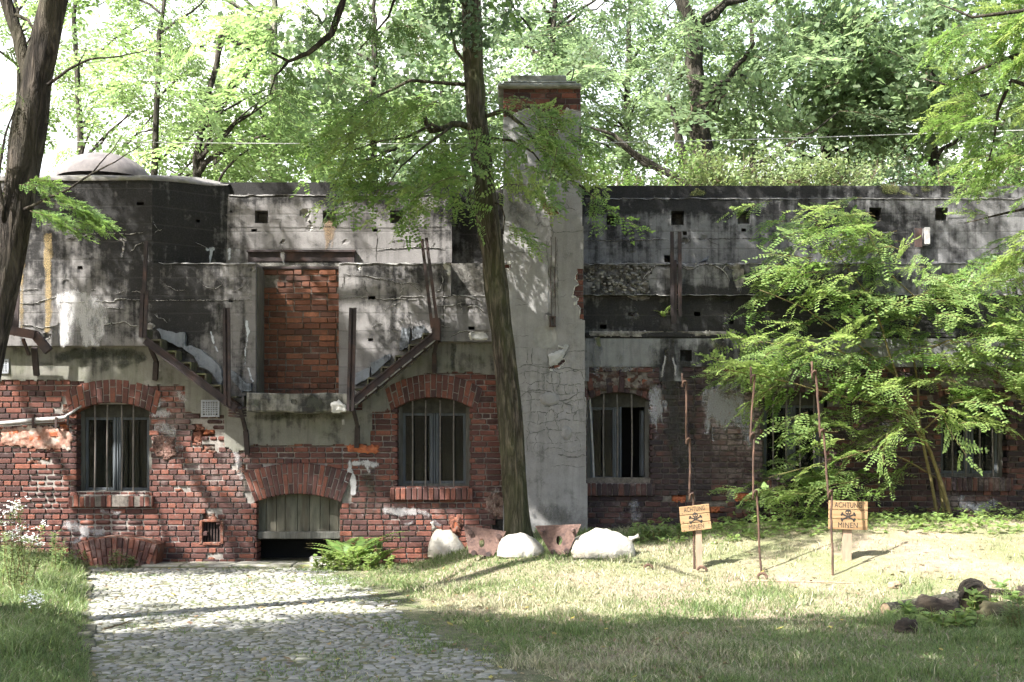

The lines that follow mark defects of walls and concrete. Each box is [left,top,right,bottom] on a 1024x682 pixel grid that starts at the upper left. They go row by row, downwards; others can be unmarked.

flaking render [503,89,581,148]
crack [66,221,162,252]
corrosion [44,234,52,333]
damp [47,289,146,370]
crack [20,279,250,329]
flaking render [548,344,569,371]
spalling [571,264,655,319]
crack [519,335,589,467]
spalling [1,404,81,464]
spalling [152,435,176,460]